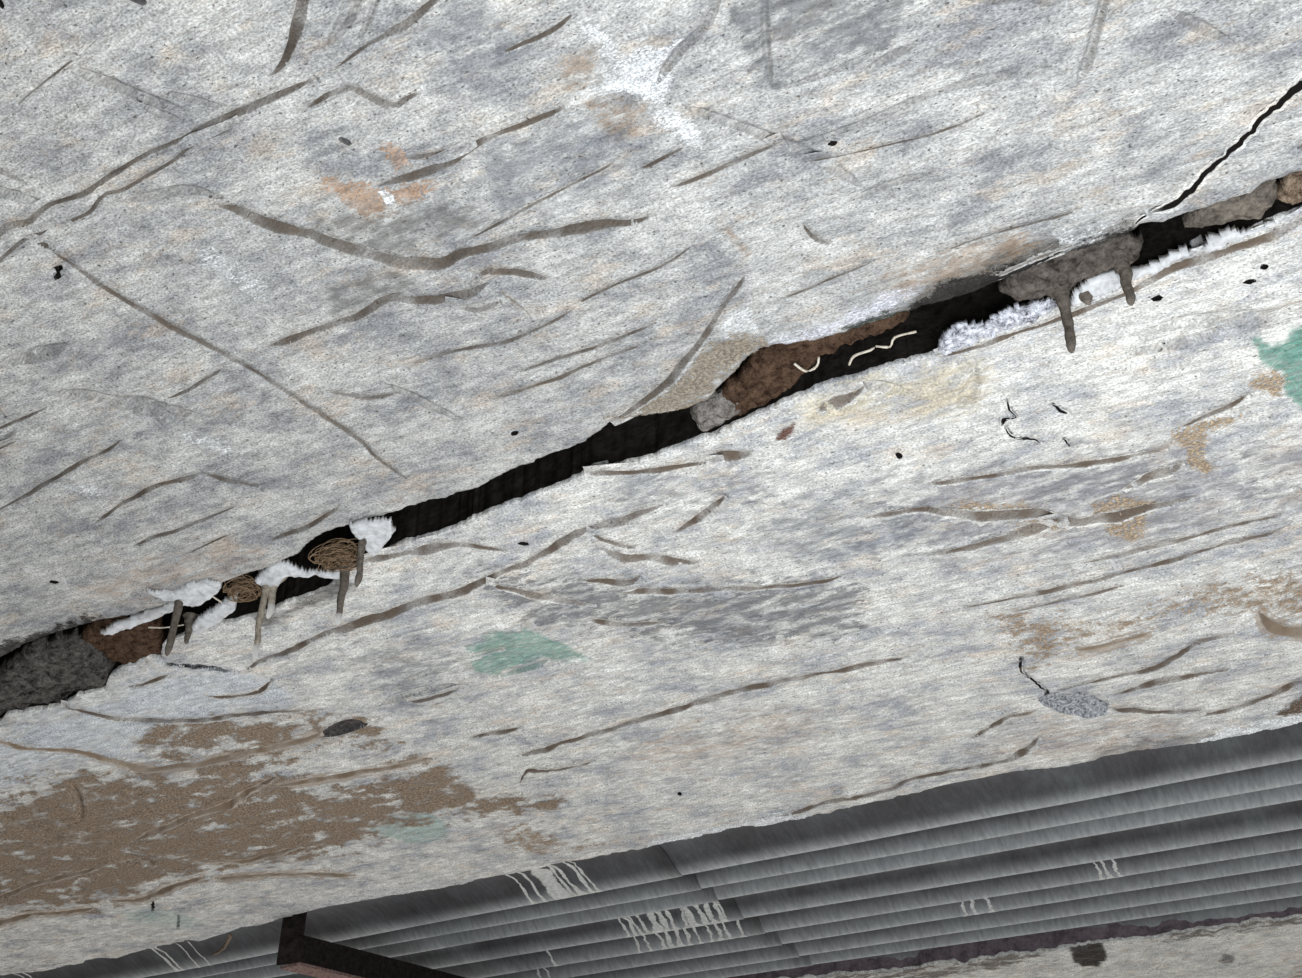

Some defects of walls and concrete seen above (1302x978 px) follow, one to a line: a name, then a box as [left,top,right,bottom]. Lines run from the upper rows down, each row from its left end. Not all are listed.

water stain [937,219,1276,355]
crack [1000,400,1072,448]
crack [165,660,232,675]
crack [1017,660,1046,692]